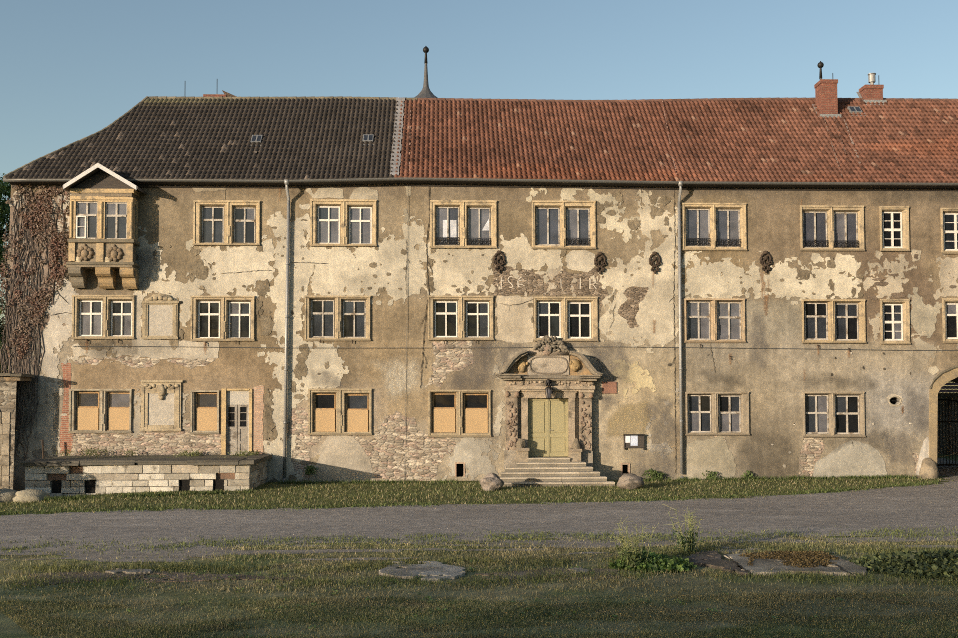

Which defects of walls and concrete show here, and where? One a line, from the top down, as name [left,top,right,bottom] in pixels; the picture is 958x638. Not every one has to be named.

flaking render [10,187,958,482]